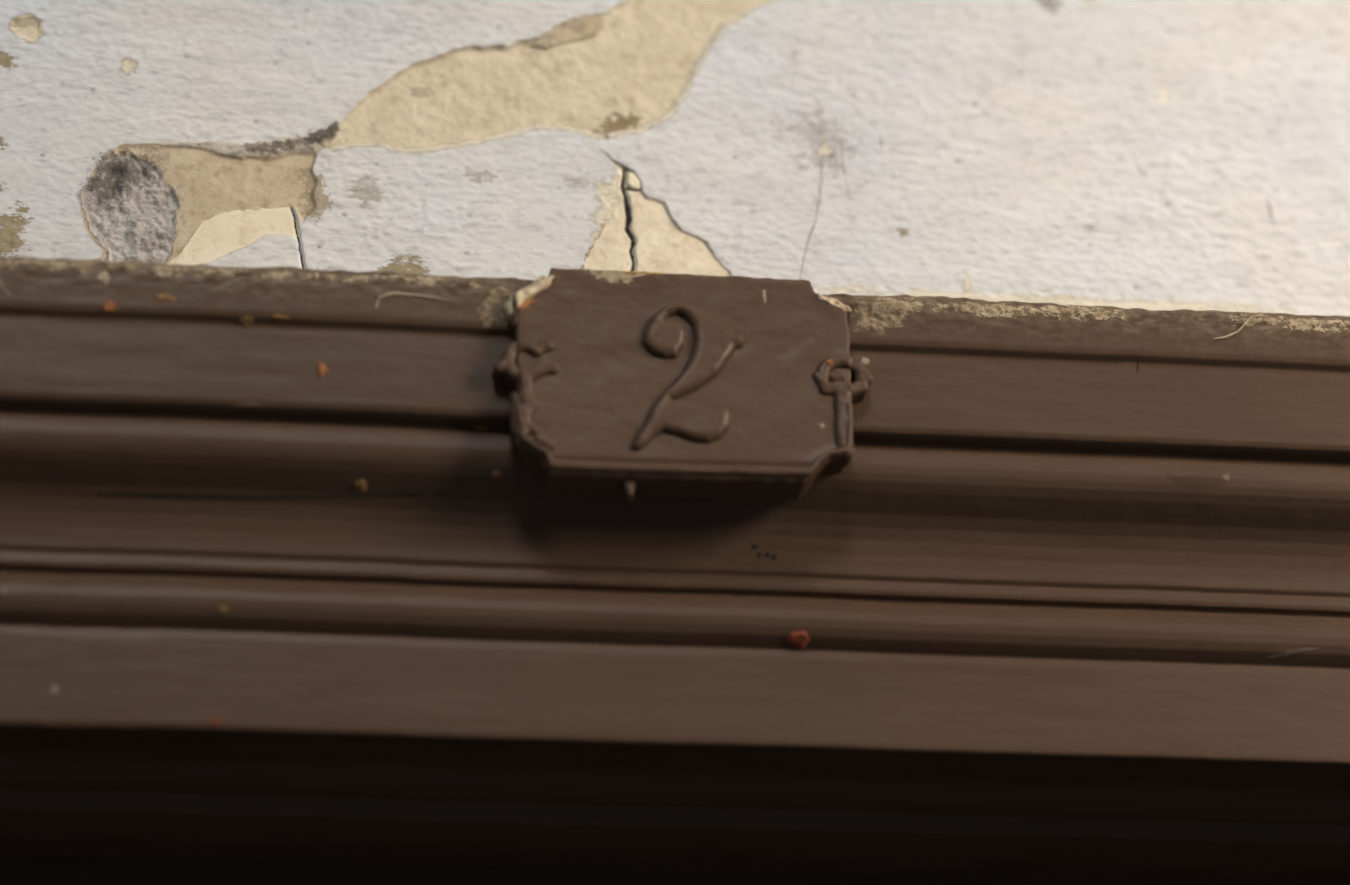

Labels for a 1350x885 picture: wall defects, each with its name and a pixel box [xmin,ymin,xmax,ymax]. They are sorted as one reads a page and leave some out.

peeling [9,13,45,43]
peeling [79,0,773,284]